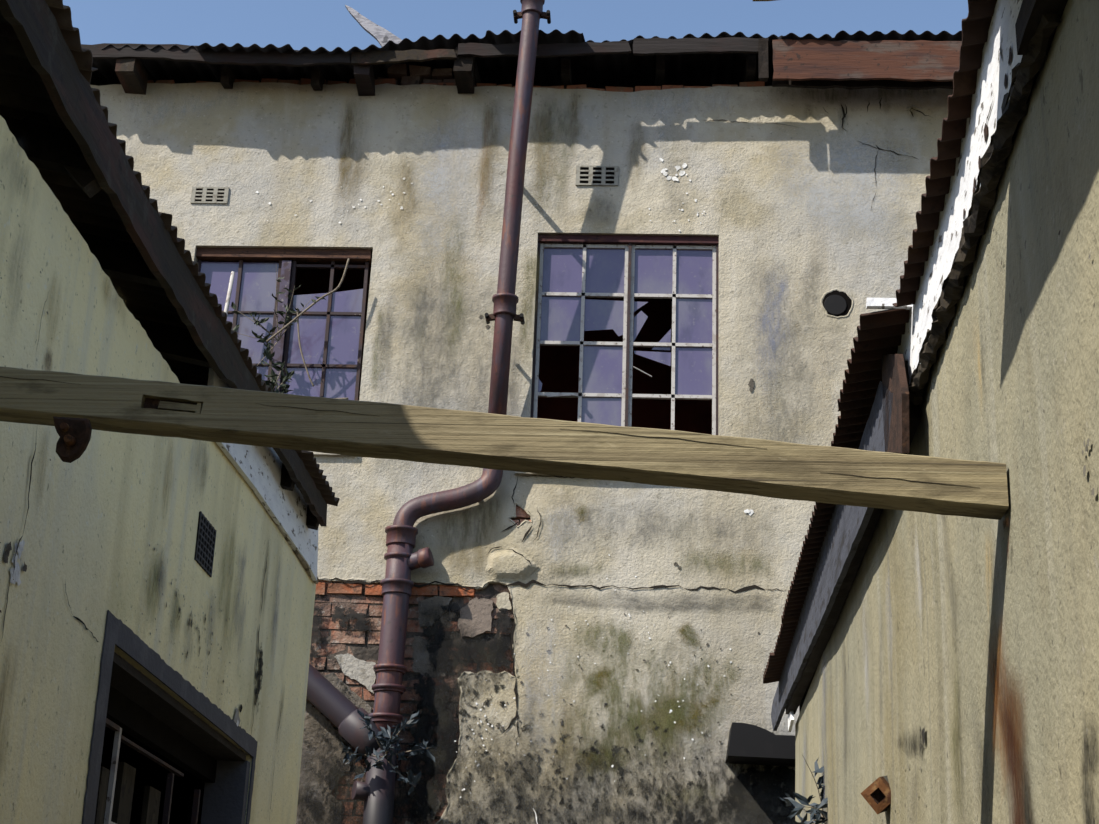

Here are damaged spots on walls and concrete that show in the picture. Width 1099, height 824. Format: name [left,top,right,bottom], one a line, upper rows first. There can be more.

crack [824,98,917,208]
peeling [4,539,27,586]
crack [1,431,37,641]
crack [320,577,381,585]
spalling [508,502,533,528]
leakage [255,645,263,712]
flaking render [296,701,353,824]
flaking render [324,653,376,714]
flaking render [405,579,536,824]
leakage [394,603,795,824]
crack [414,580,779,747]